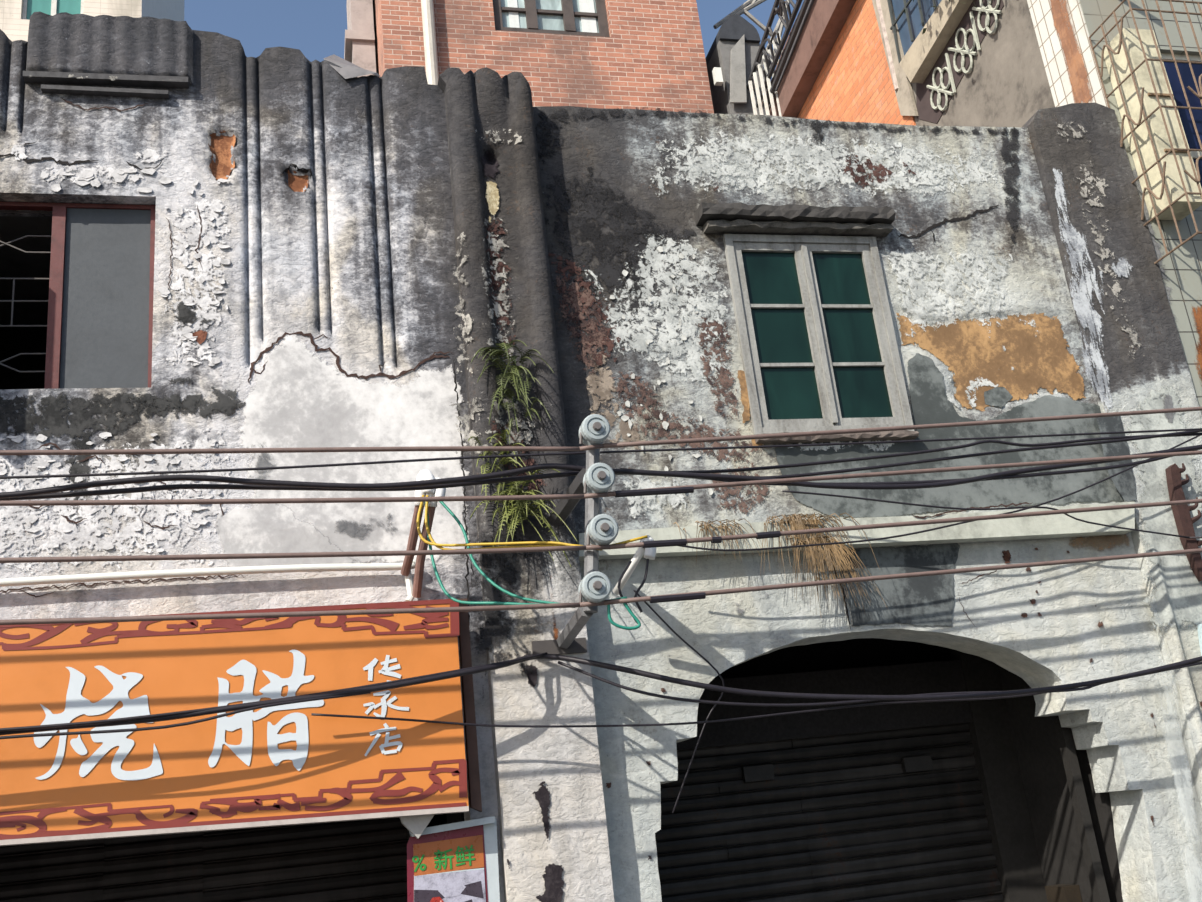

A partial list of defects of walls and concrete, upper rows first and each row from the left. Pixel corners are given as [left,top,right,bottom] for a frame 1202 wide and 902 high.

crack [0,141,164,170]
peeling [0,427,237,574]
damp [0,377,246,509]
damp [171,301,217,326]
peeling [158,180,232,366]
crack [248,331,474,624]
peeling [548,235,772,518]
damp [535,106,1021,312]
crack [896,204,999,244]
flaking render [885,244,1086,412]
damp [1053,169,1137,502]
rust [1192,305,1202,381]